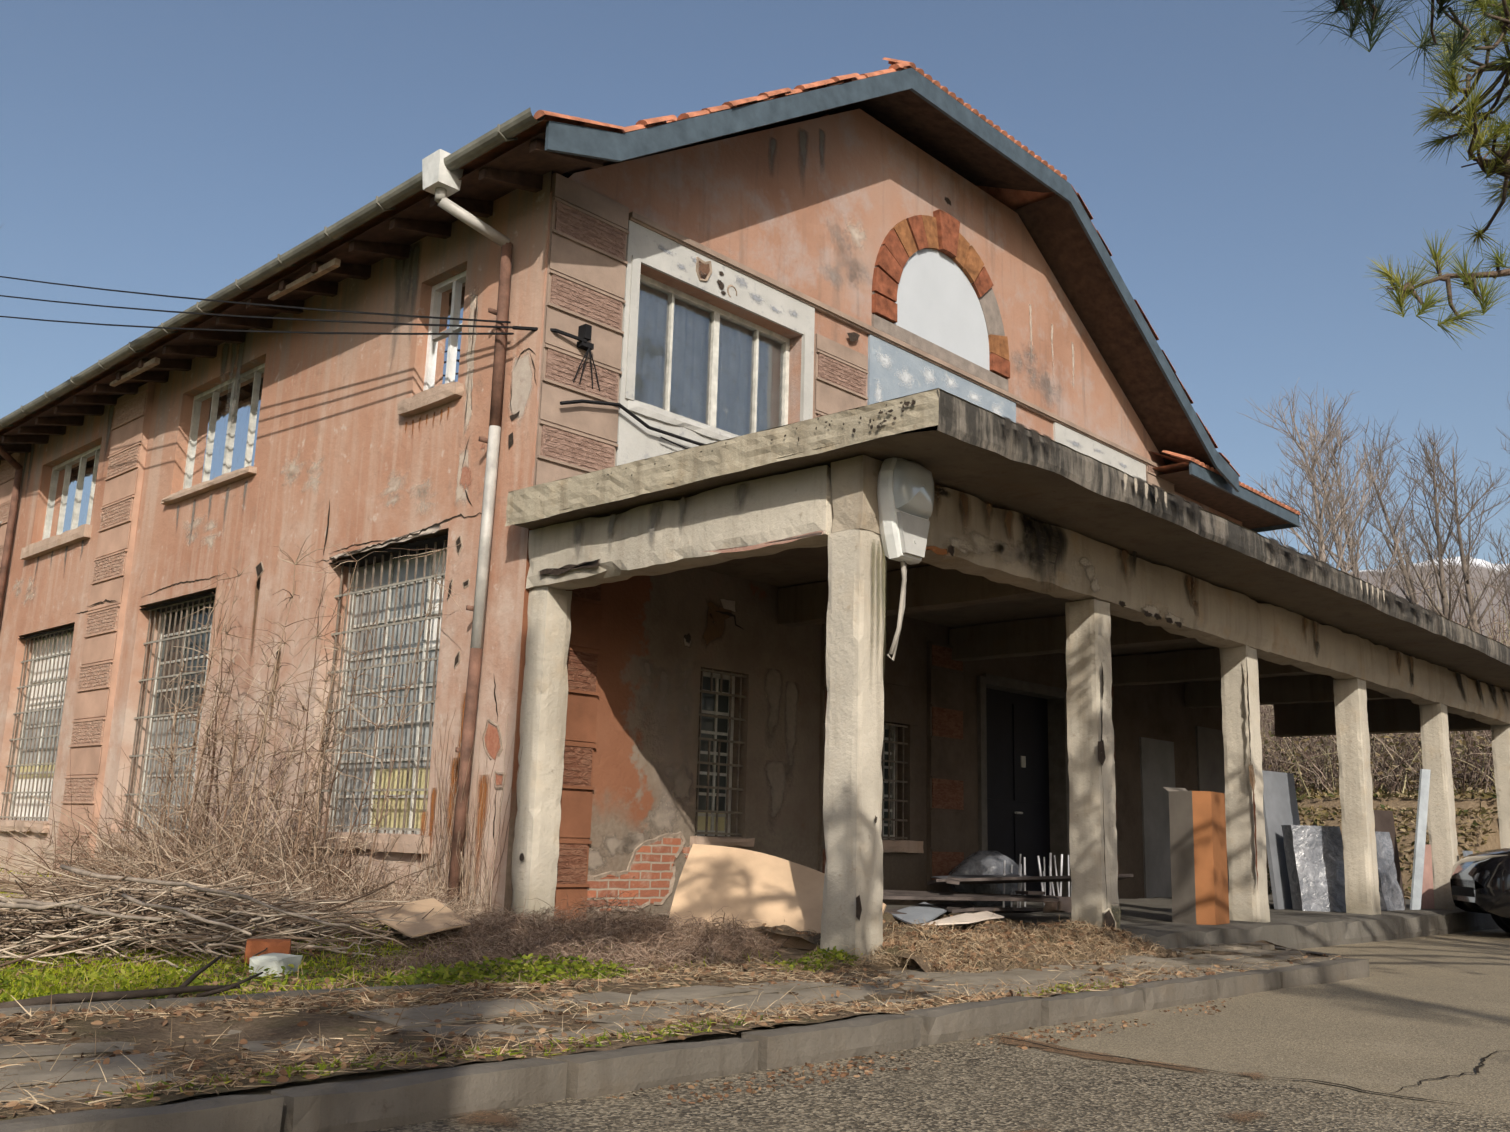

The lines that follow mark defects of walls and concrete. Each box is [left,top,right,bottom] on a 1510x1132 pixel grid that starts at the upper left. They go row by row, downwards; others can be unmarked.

leakage [935,485,1067,577]
crack [987,1034,1510,1106]